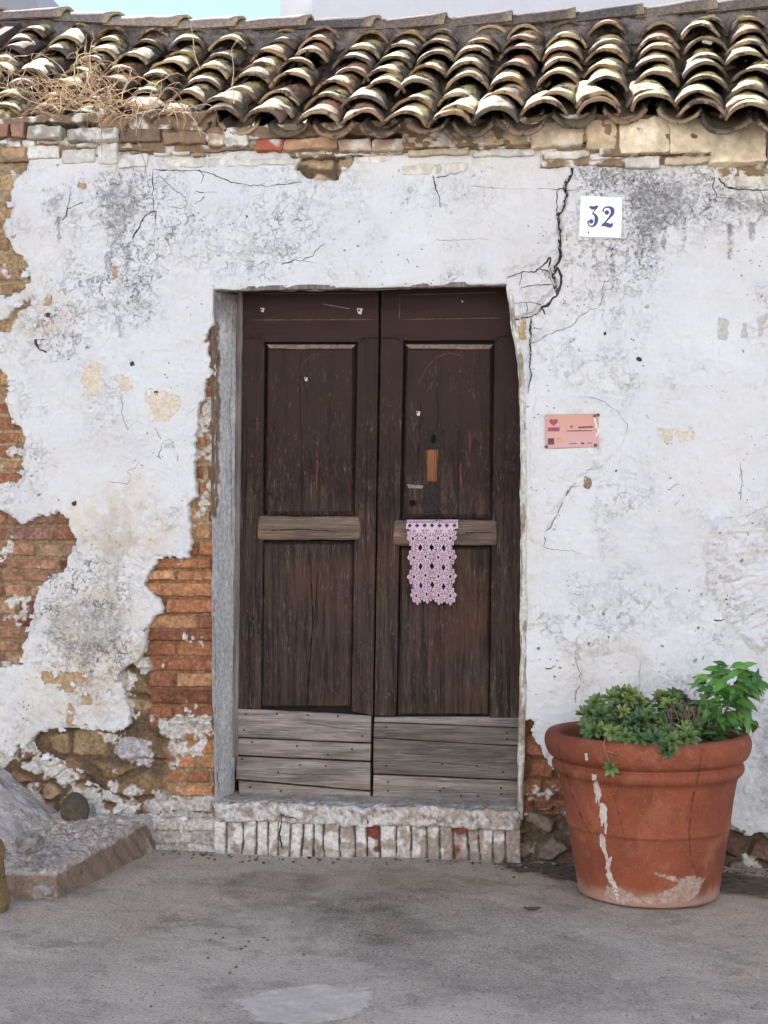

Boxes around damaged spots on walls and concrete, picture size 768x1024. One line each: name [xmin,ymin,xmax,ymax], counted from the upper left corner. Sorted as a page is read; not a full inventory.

crack [132,169,297,239]
flaking render [297,159,354,181]
flaking render [0,163,52,333]
crack [506,168,607,394]
peeling [657,427,695,444]
crack [544,468,598,552]
flaking render [0,329,219,822]
flaking render [520,719,574,864]
flaking render [724,826,768,869]